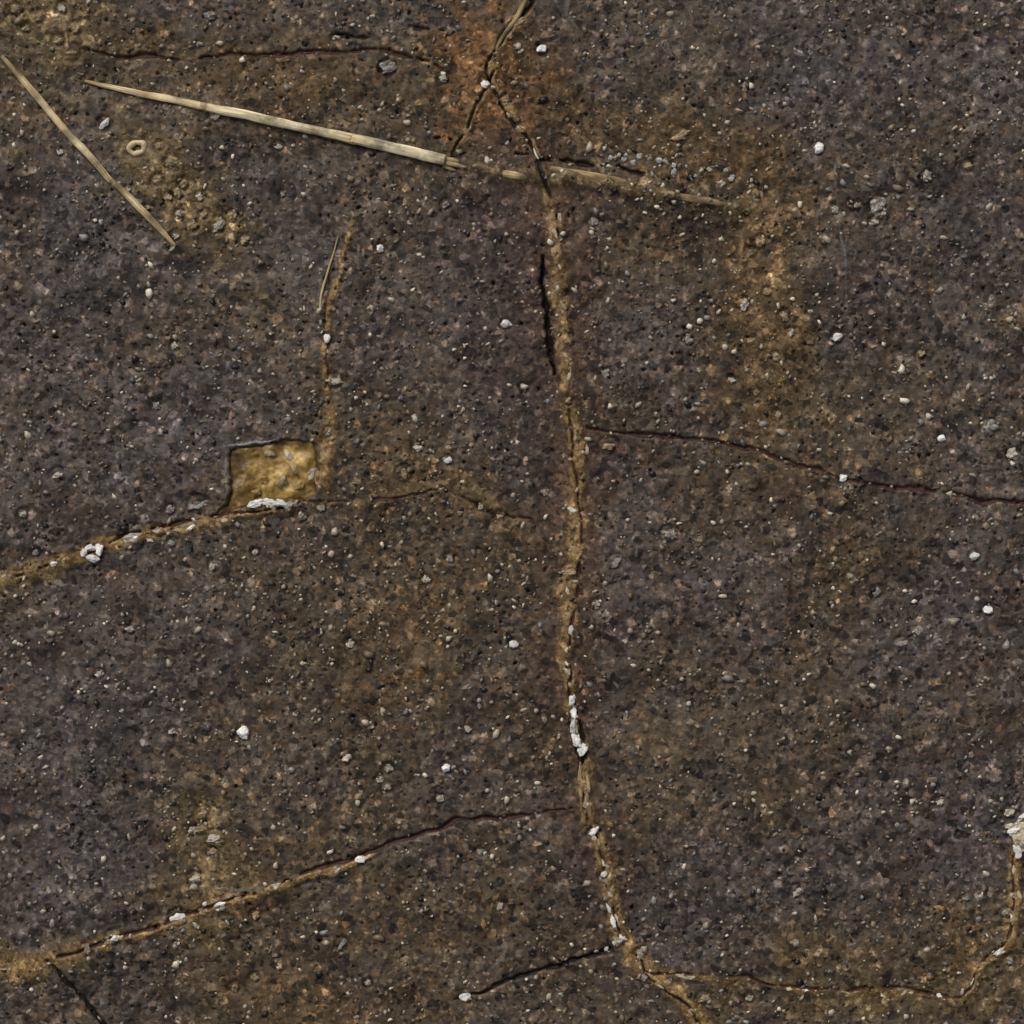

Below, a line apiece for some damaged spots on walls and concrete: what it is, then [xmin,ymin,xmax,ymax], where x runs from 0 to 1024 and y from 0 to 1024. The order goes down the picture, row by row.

spalling [218,440,317,515]
crack [0,483,535,586]
crack [451,0,1024,1024]
crack [0,813,530,1024]